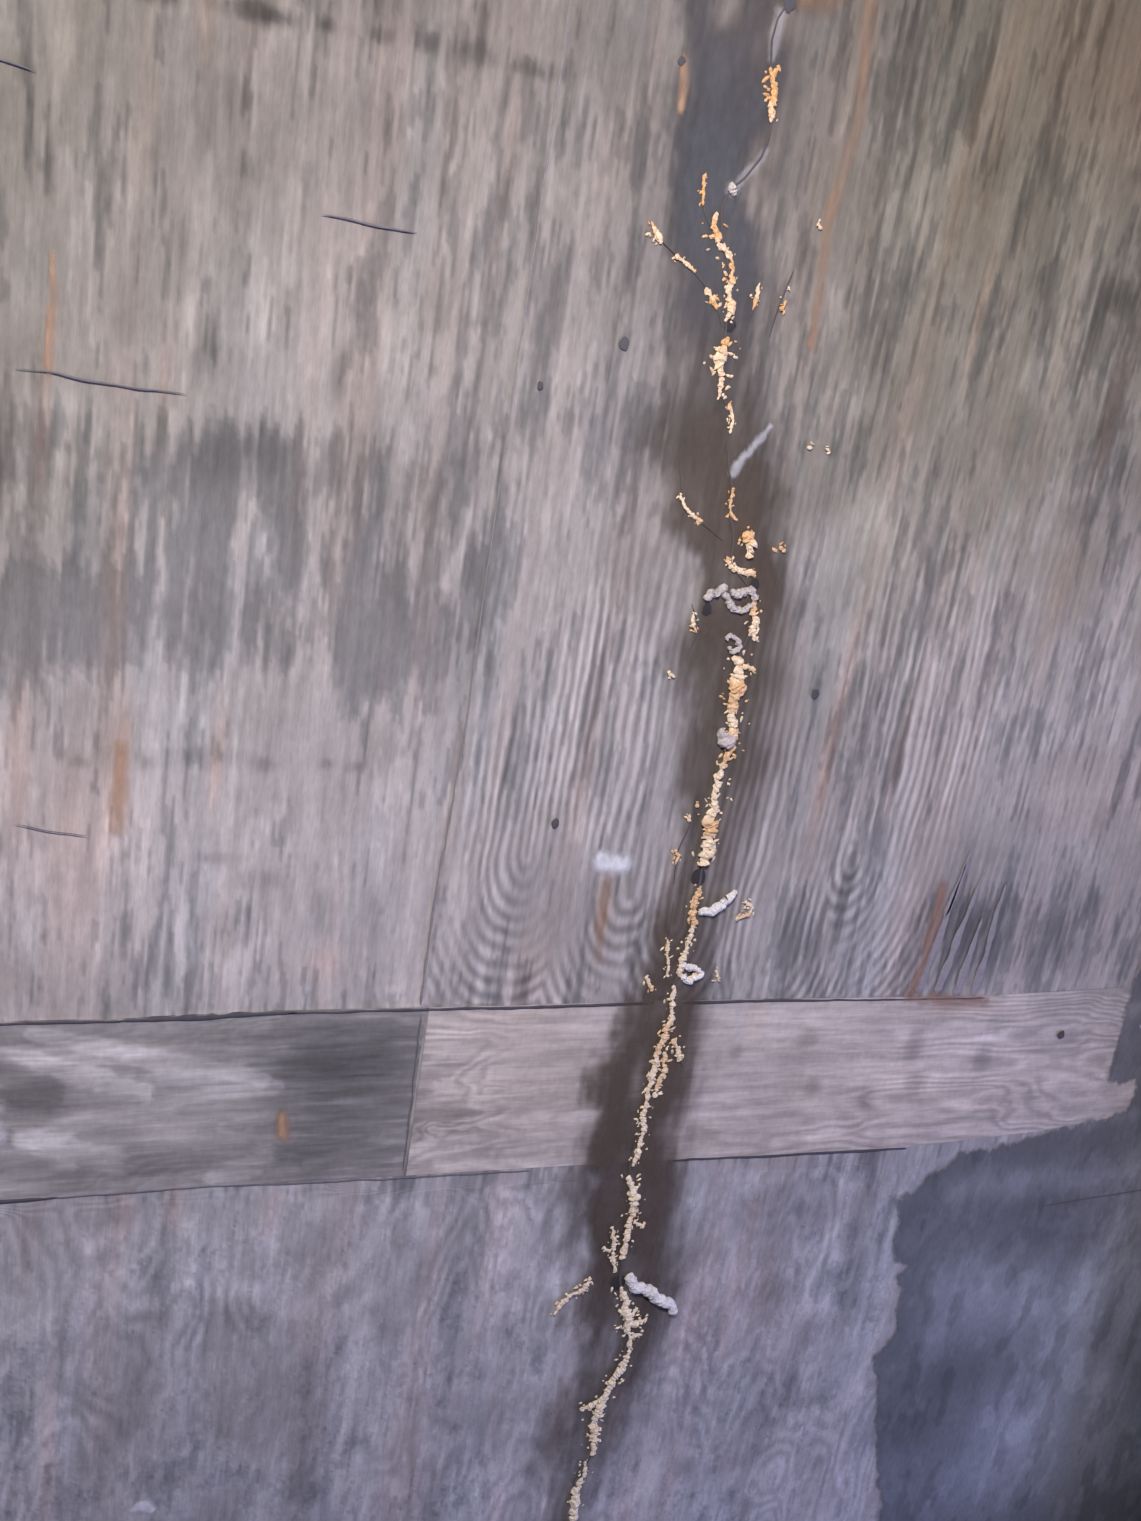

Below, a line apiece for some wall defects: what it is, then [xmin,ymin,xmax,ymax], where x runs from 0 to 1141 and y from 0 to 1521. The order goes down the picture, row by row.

crack [650,0,794,339]
crack [679,375,759,589]
crack [690,604,712,648]
crack [733,636,750,674]
crack [663,722,732,1066]
peeling [914,851,1006,996]
crack [552,1091,650,1368]
crack [573,1421,597,1487]